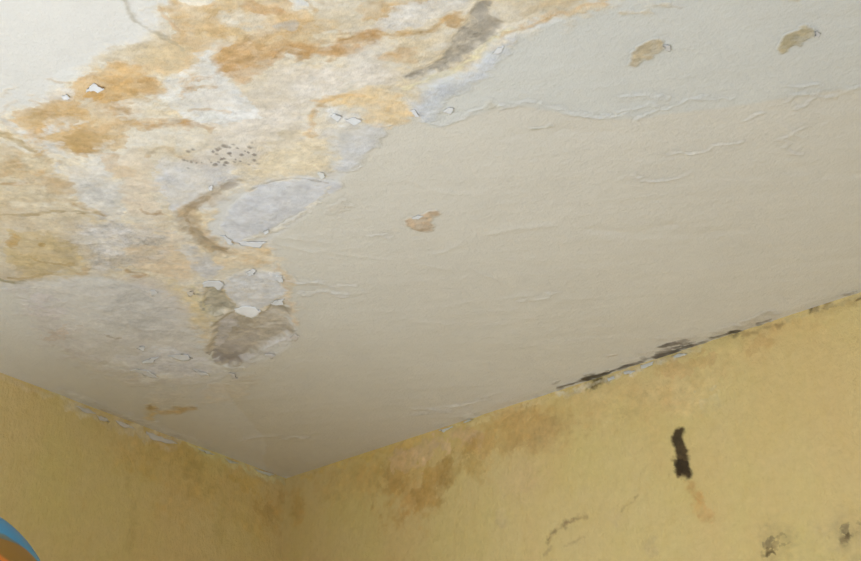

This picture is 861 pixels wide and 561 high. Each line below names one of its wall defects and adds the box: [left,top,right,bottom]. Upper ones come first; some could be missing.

peeling [86,83,104,93]
peeling [399,0,520,125]
peeling [626,37,671,68]
peeling [775,22,821,55]
peeling [218,172,345,248]
damp [0,0,685,424]
peeling [403,209,443,233]
spalling [102,267,300,385]
damp [98,290,861,561]